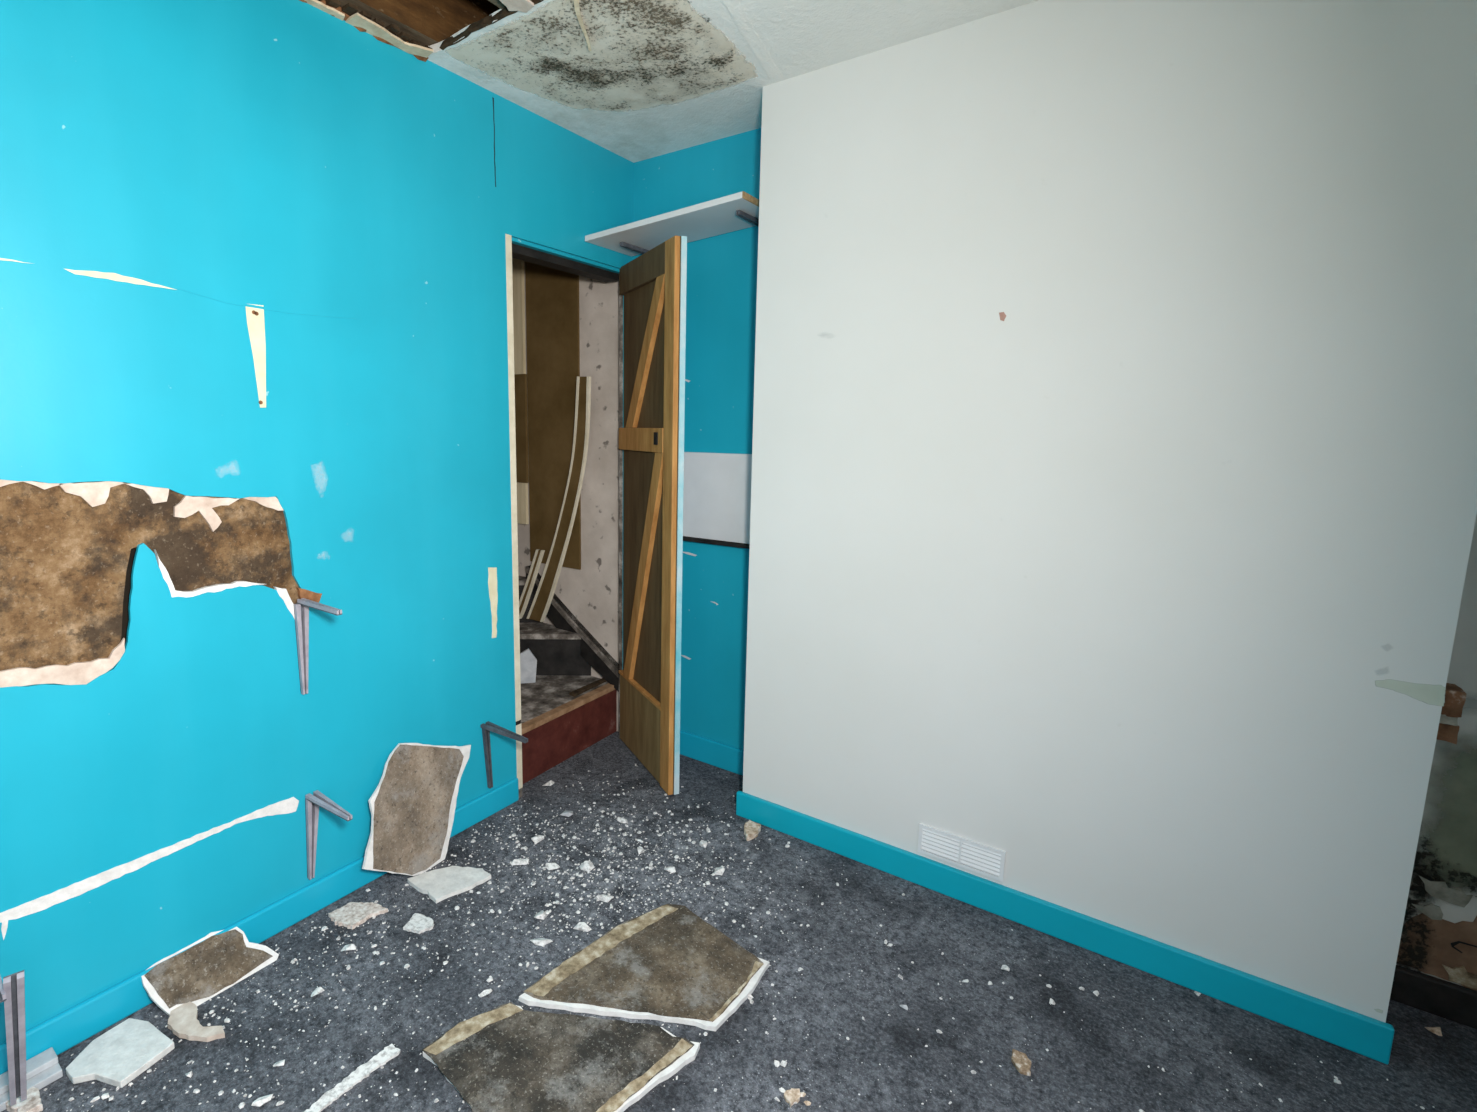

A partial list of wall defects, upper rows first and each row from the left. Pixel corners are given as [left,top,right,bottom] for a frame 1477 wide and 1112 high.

peeling [300,0,433,62]
peeling [500,0,534,13]
water stain [480,0,740,110]
peeling [65,269,358,319]
spalling [0,479,322,688]
peeling [0,797,299,940]
water stain [1396,746,1477,972]